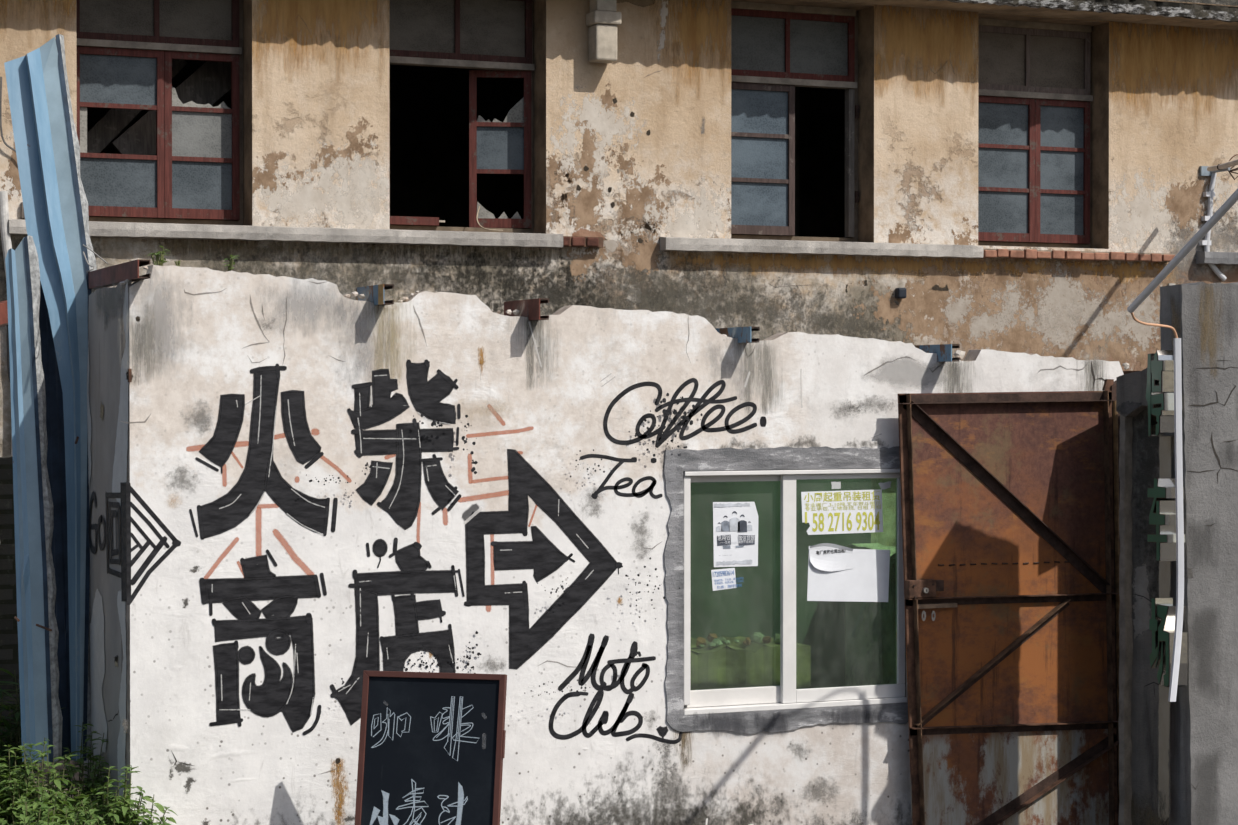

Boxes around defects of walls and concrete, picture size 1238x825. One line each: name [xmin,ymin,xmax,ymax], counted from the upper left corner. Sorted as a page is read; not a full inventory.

water stain [252,0,389,62]
water stain [872,4,978,89]
water stain [1107,21,1238,103]
peeling [0,128,21,201]
peeling [546,83,731,282]
water stain [159,220,1238,412]
peeling [846,168,1238,386]
crack [1188,360,1238,482]
water stain [547,714,786,825]
water stain [808,778,834,798]